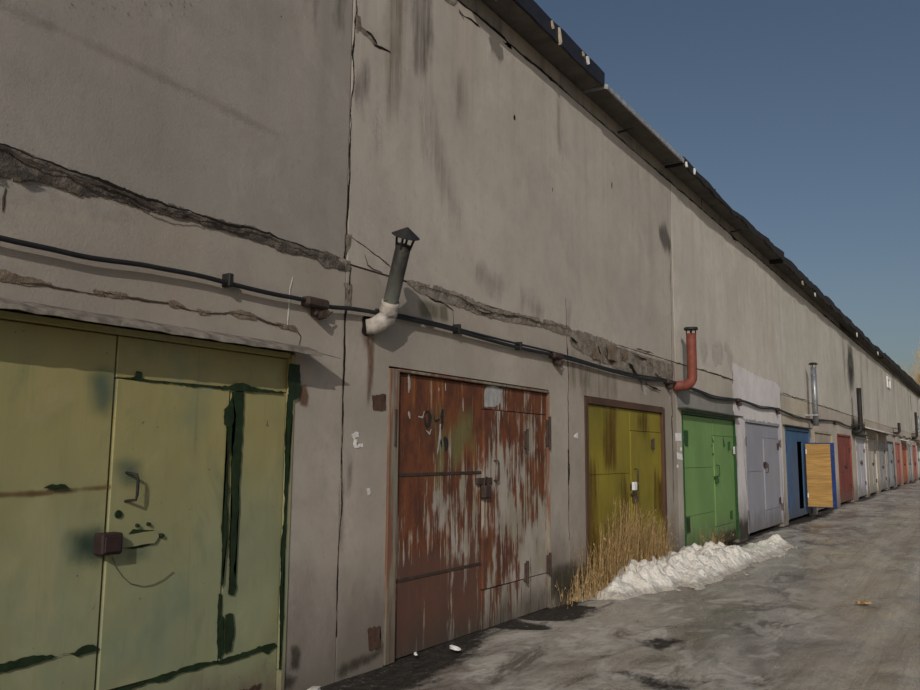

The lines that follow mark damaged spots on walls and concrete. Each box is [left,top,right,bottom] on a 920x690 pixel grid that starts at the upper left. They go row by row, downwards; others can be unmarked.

flaking render [0,143,345,270]
leakage [659,228,671,248]
crack [457,0,919,409]
flaking render [0,269,301,344]
crack [336,0,391,637]
flaking render [406,280,673,395]